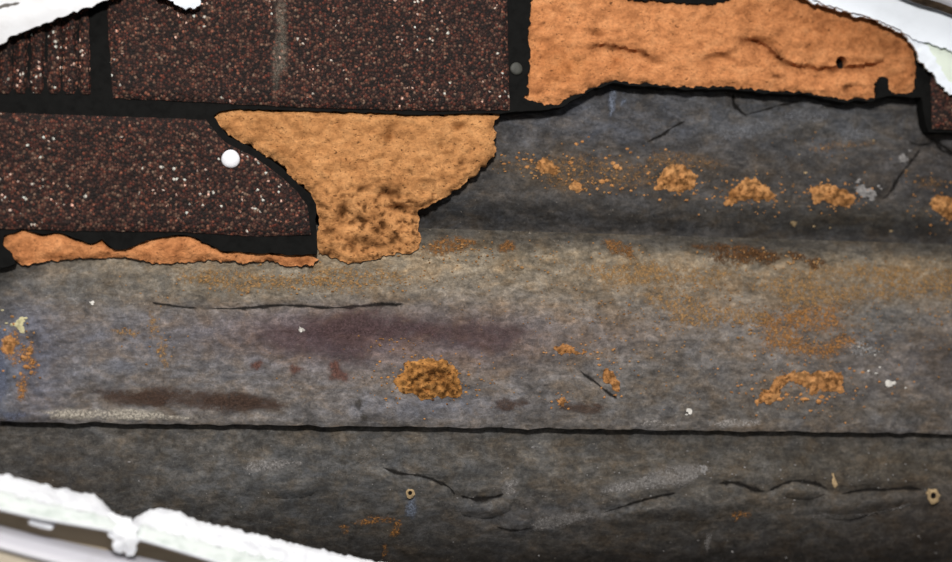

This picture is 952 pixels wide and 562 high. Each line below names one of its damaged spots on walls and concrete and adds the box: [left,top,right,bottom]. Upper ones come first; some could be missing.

crack [883,140,952,199]
peeling [844,178,883,201]
crack [152,302,402,310]
peeling [1,310,28,333]
leakage [56,387,283,419]
peeling [777,393,829,404]
crack [383,467,503,502]
crack [720,479,922,494]
crack [604,493,674,513]